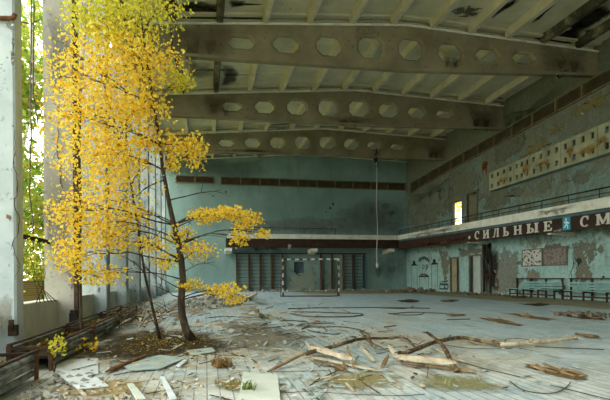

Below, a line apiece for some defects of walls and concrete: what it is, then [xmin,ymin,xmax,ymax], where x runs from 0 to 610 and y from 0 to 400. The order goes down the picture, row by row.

leakage [550,6,610,44]
leakage [220,67,237,85]
peeling [491,246,540,294]
peeling [544,241,604,288]